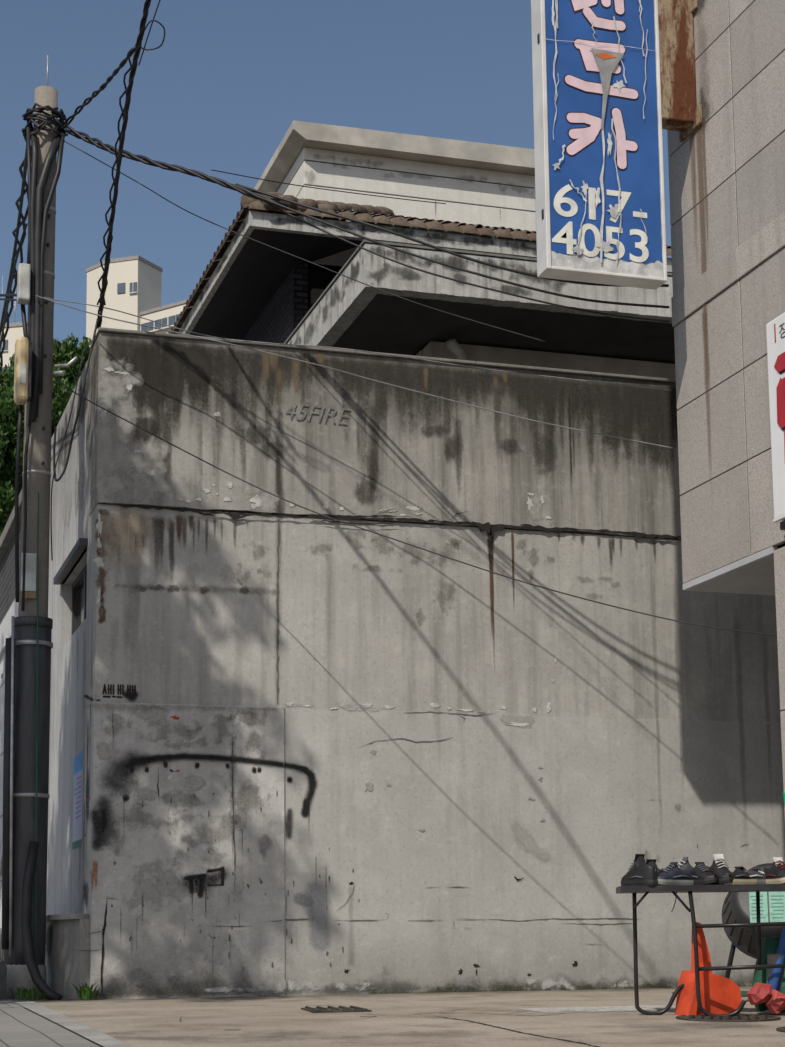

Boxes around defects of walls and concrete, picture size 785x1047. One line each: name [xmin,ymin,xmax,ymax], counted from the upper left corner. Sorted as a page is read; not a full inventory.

damp [319,262,359,321]
damp [372,247,465,284]
damp [484,260,564,295]
damp [60,324,678,502]